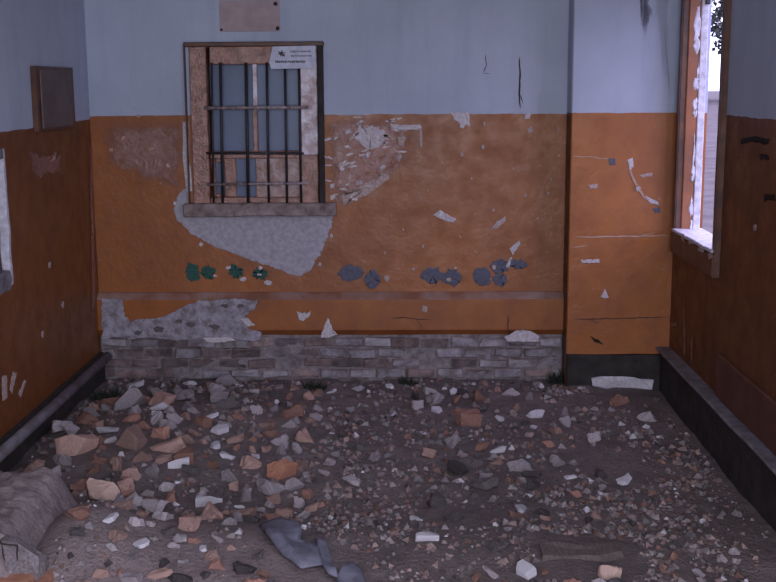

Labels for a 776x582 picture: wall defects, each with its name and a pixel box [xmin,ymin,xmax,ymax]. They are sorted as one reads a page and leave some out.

peeling [109,122,333,285]
peeling [325,116,422,205]
peeling [433,210,456,223]
peeling [450,112,470,128]
crack [516,57,524,109]
peeling [627,158,661,213]
flaking render [100,298,563,480]
spalling [51,412,212,521]